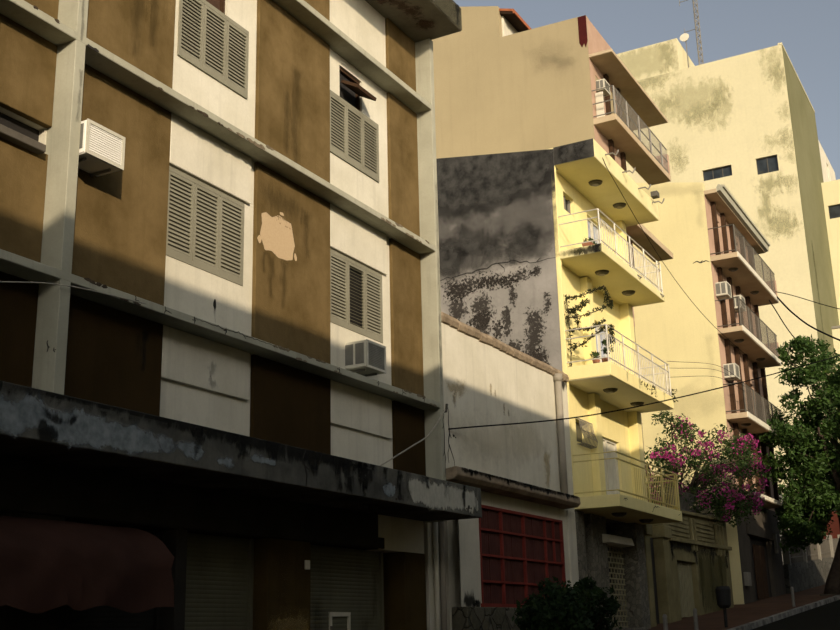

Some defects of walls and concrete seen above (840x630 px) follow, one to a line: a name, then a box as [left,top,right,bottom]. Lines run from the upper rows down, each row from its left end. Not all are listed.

leakage [431,0,462,30]
leakage [436,138,594,276]
peeling [257,212,297,261]
crack [440,257,556,281]
leakage [0,381,387,497]